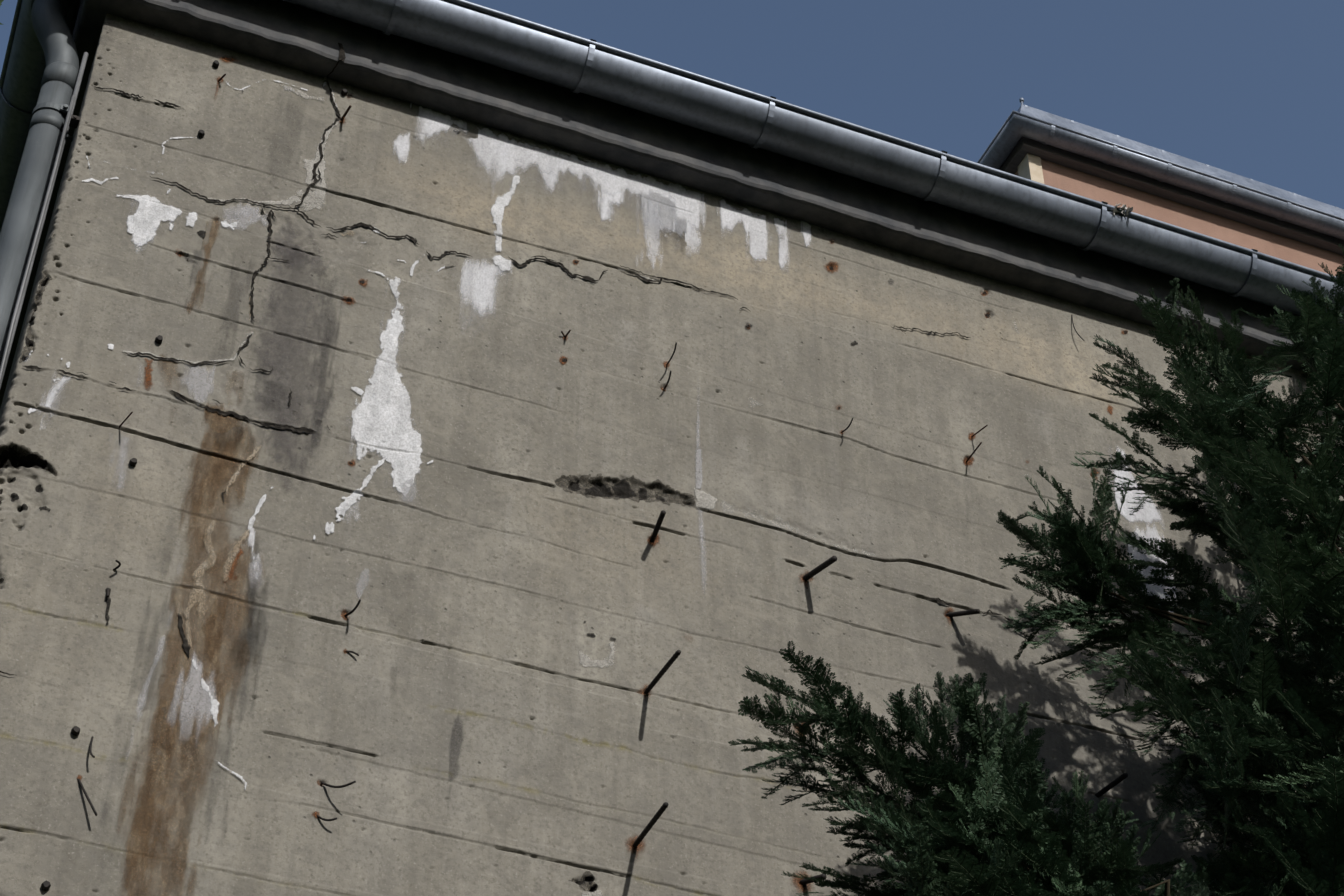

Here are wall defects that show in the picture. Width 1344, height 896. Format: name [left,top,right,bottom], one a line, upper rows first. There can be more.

crack [95,86,180,107]
crack [123,43,472,455]
crack [509,256,751,313]
crack [23,365,132,391]
corrosion [145,358,166,388]
spalling [0,442,57,512]
spalling [555,474,696,507]
crack [178,611,191,659]
corrosion [127,405,252,896]